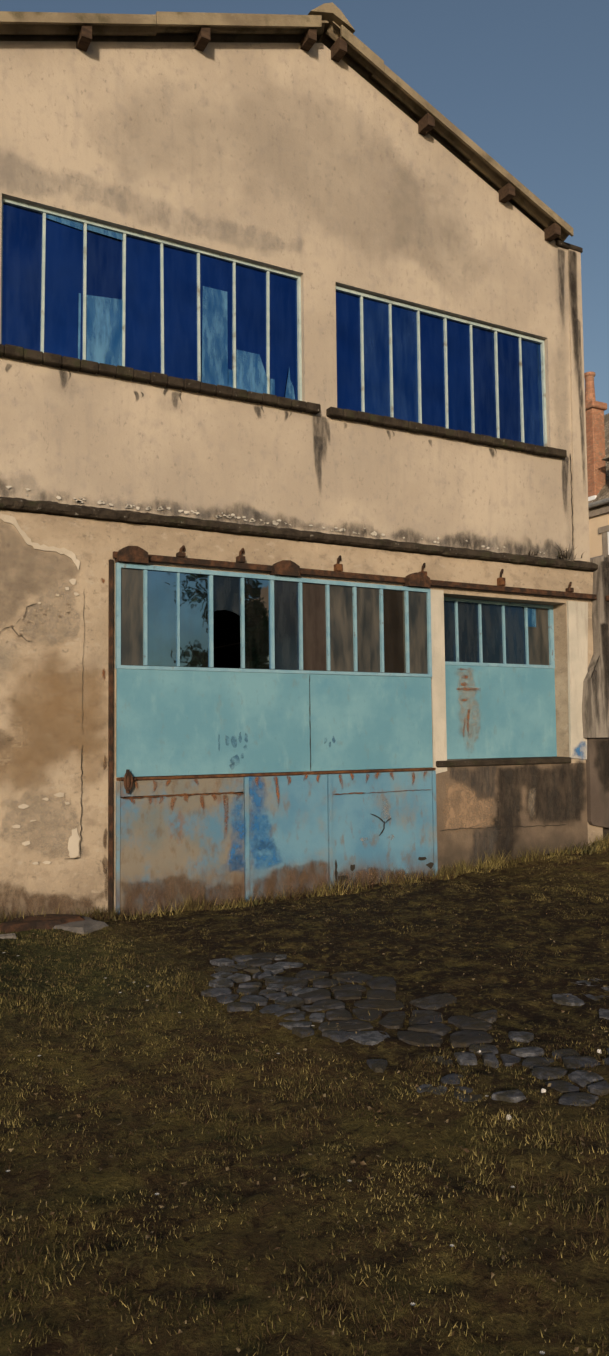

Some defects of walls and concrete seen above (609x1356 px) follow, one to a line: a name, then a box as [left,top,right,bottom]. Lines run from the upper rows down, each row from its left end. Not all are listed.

water stain [508,250,584,561]
water stain [313,417,330,482]
peeling [56,496,291,526]
flaking render [0,513,80,605]
rust [457,669,478,736]
rust [122,779,244,831]
flaking render [67,828,80,858]